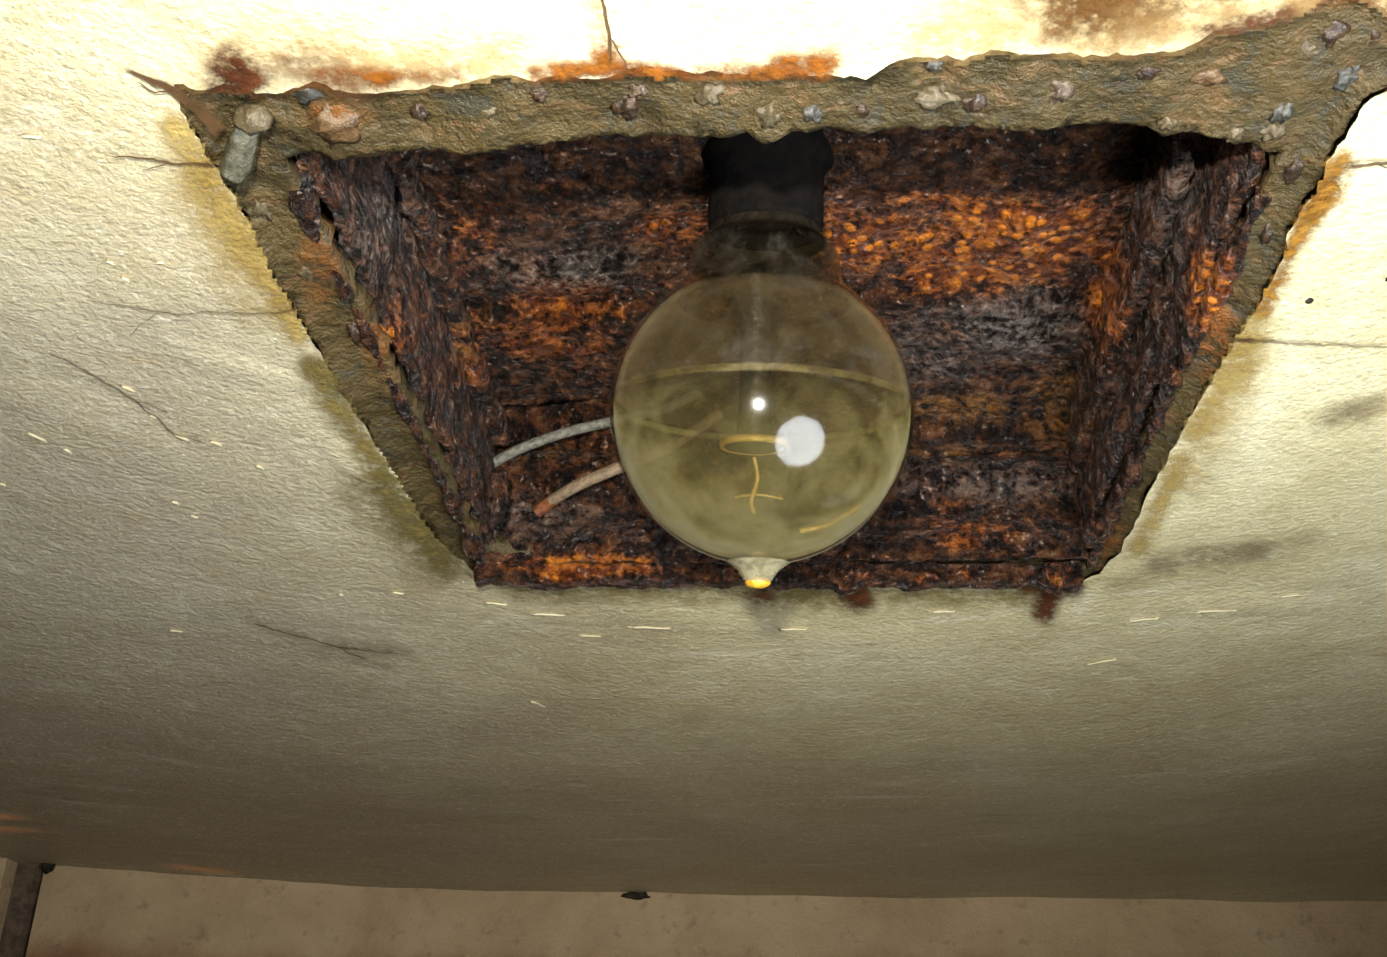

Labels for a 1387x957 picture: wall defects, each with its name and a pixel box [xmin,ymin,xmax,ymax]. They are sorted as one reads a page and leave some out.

crack [601,0,627,71]
corrosion [1045,0,1150,43]
corrosion [1204,0,1327,35]
corrosion [209,47,268,94]
corrosion [295,69,431,88]
corrosion [530,47,840,81]
crack [1347,161,1387,169]
spalling [174,0,1387,579]